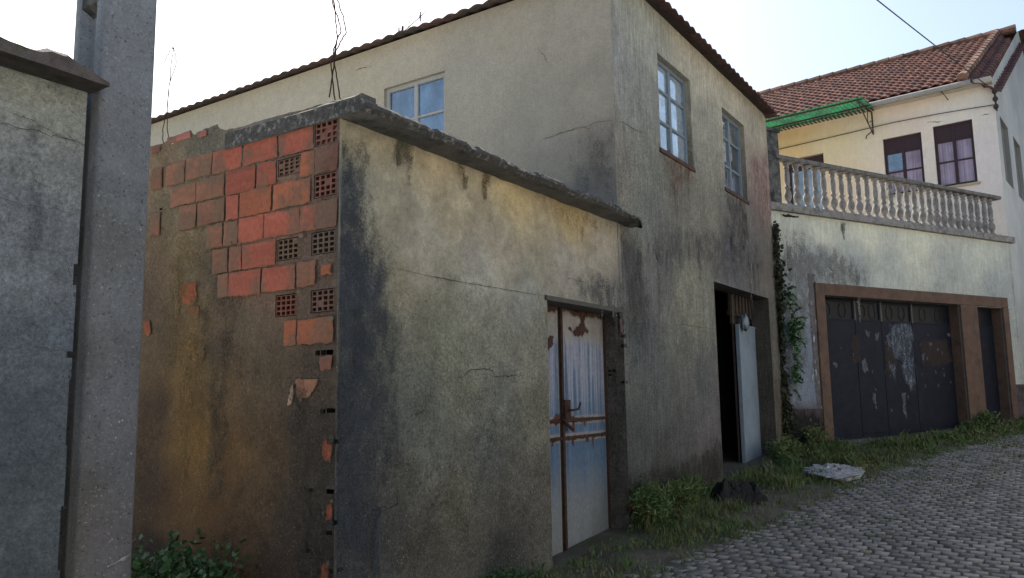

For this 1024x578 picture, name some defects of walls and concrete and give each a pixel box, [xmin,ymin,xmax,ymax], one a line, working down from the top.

flaking render [151,46,207,154]
flaking render [150,126,338,298]
flaking render [283,316,334,405]
damp [290,139,398,578]
corrosion [547,306,603,337]
peeling [865,323,951,419]